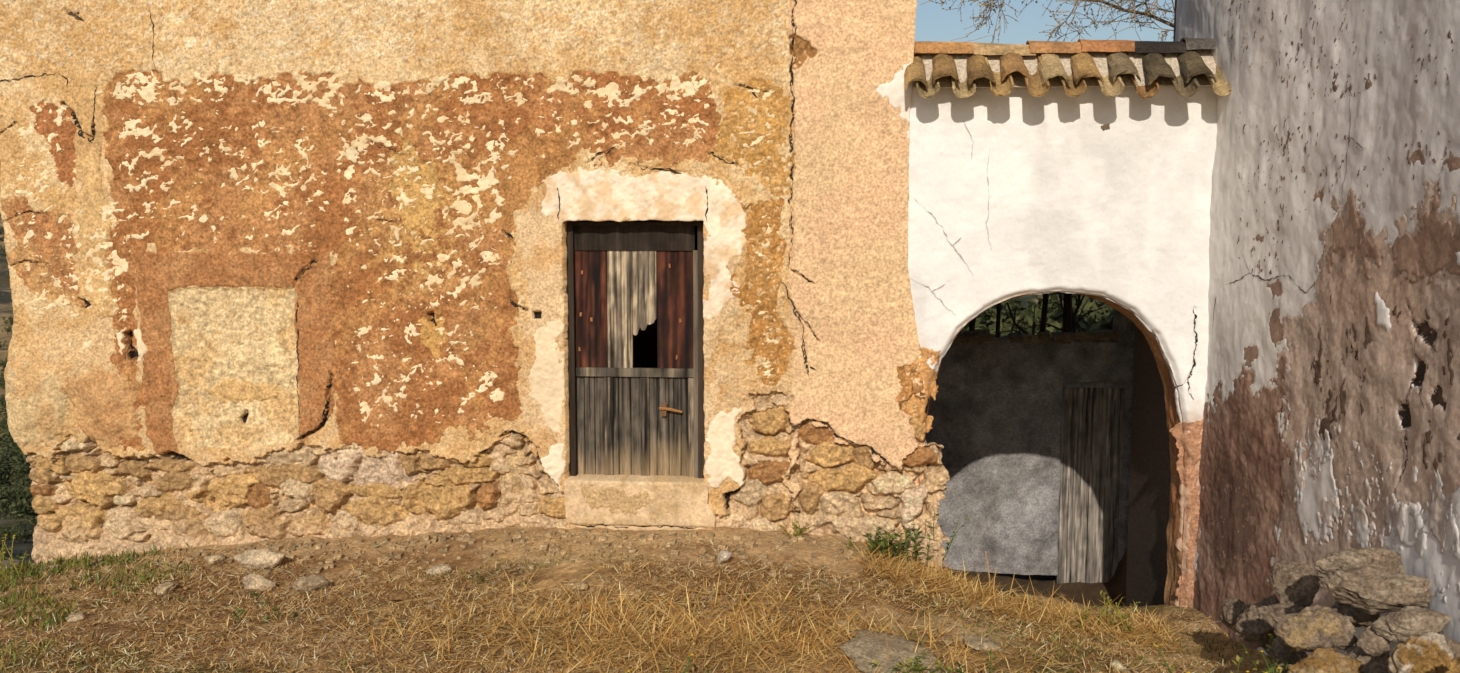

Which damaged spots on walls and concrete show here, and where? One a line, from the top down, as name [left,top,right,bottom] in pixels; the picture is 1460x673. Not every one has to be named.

crack [0,72,97,143]
crack [293,260,333,439]
flaking render [1,58,950,573]
crack [737,0,818,375]
flaking render [788,33,817,70]
flaking render [1169,0,1460,650]